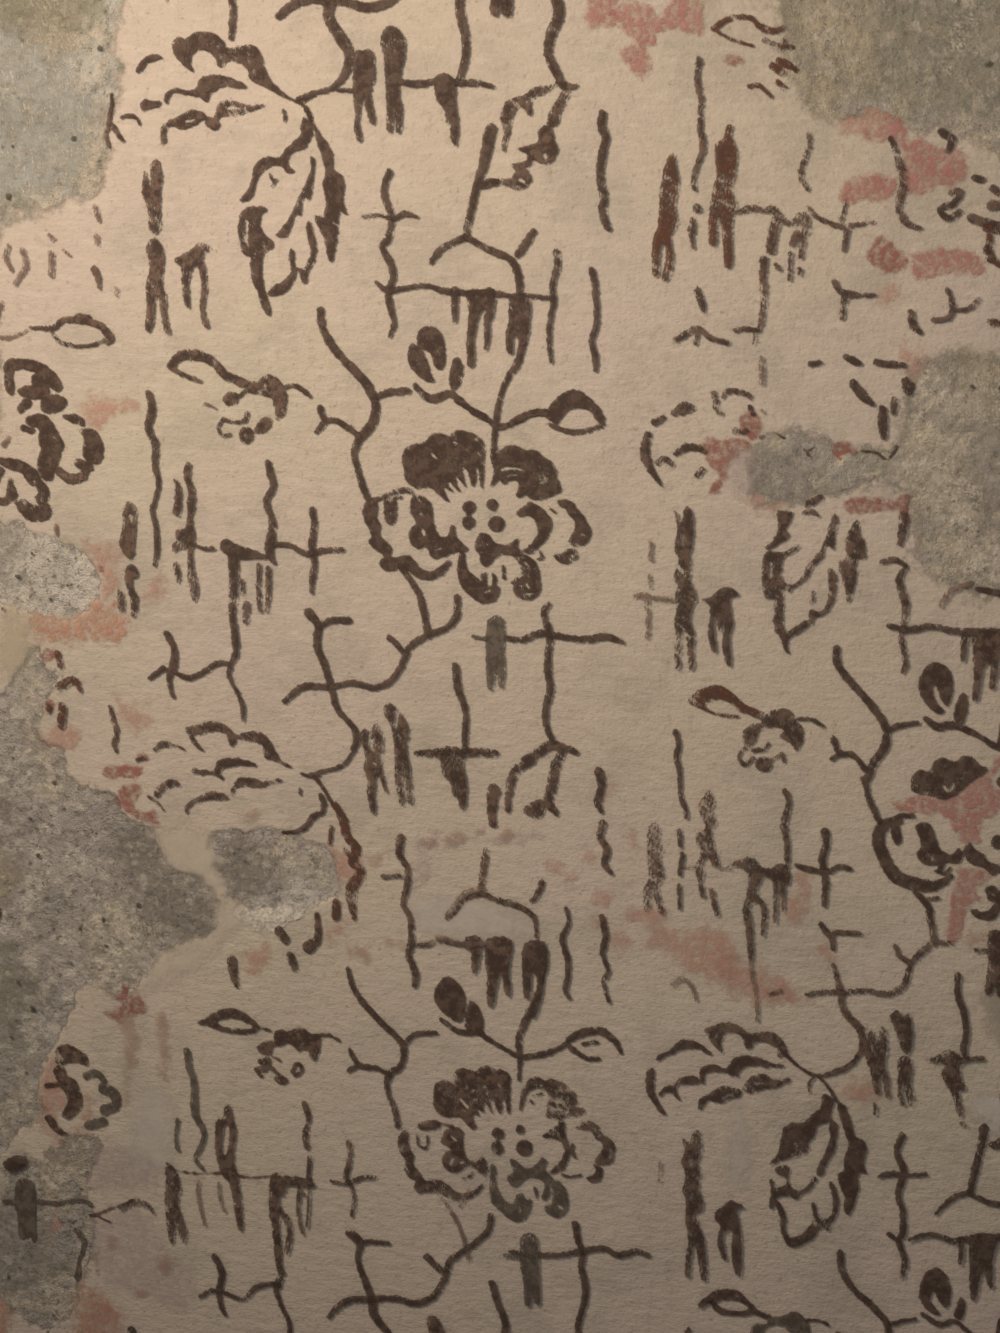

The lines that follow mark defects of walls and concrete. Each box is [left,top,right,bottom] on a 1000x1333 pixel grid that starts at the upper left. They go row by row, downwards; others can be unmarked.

flaking render [779,0,1000,155]
flaking render [0,520,101,621]
flaking render [702,349,1000,601]
flaking render [0,646,358,1333]